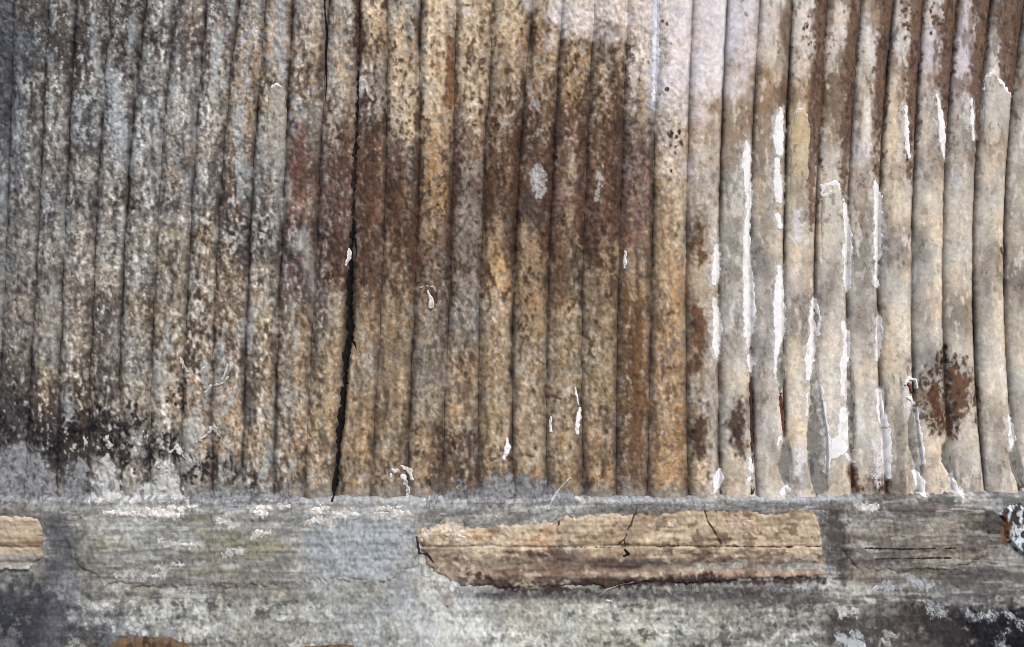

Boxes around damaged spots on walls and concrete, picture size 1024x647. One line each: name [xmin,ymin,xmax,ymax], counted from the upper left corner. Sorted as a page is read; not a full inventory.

spalling [898,101,911,159]
spalling [929,91,951,161]
flaking render [964,70,1011,150]
crack [330,48,360,502]
spalling [706,240,725,360]
spalling [738,140,794,500]
flaking render [769,107,856,294]
spalling [868,173,886,289]
leakage [0,386,213,485]
spalling [801,297,858,495]
spalling [908,406,972,503]
corrosion [912,344,978,440]